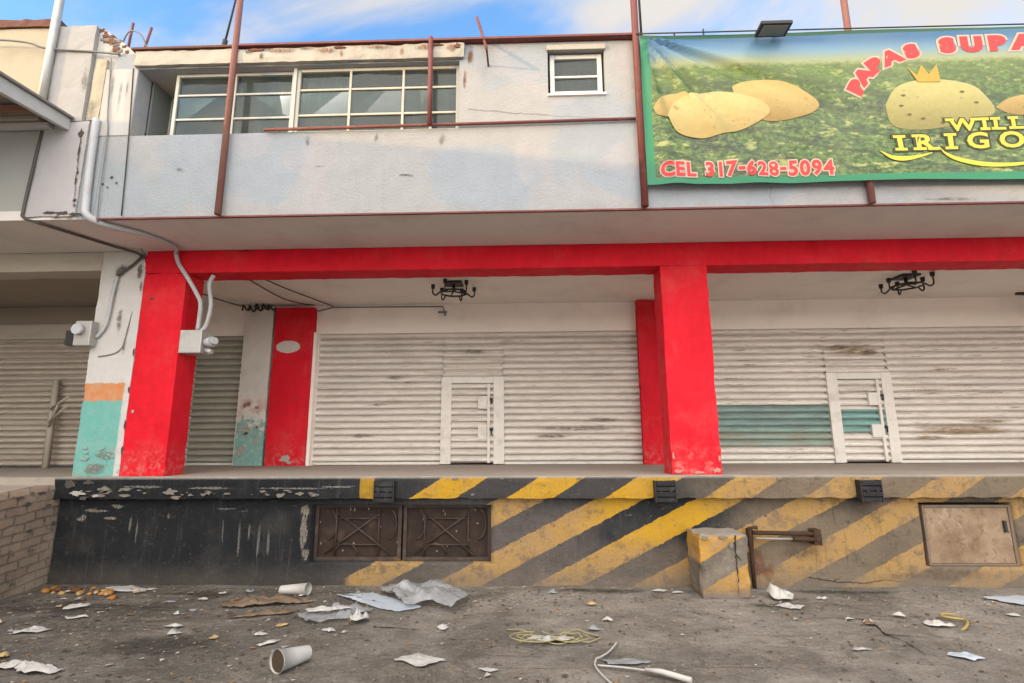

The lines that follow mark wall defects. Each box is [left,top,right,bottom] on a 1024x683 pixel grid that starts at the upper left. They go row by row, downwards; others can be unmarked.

flaking render [99,22,135,54]
spalling [15,446,230,521]
flaking render [250,486,351,560]
crack [733,535,741,595]
corrosion [745,526,823,589]
crack [810,576,902,584]